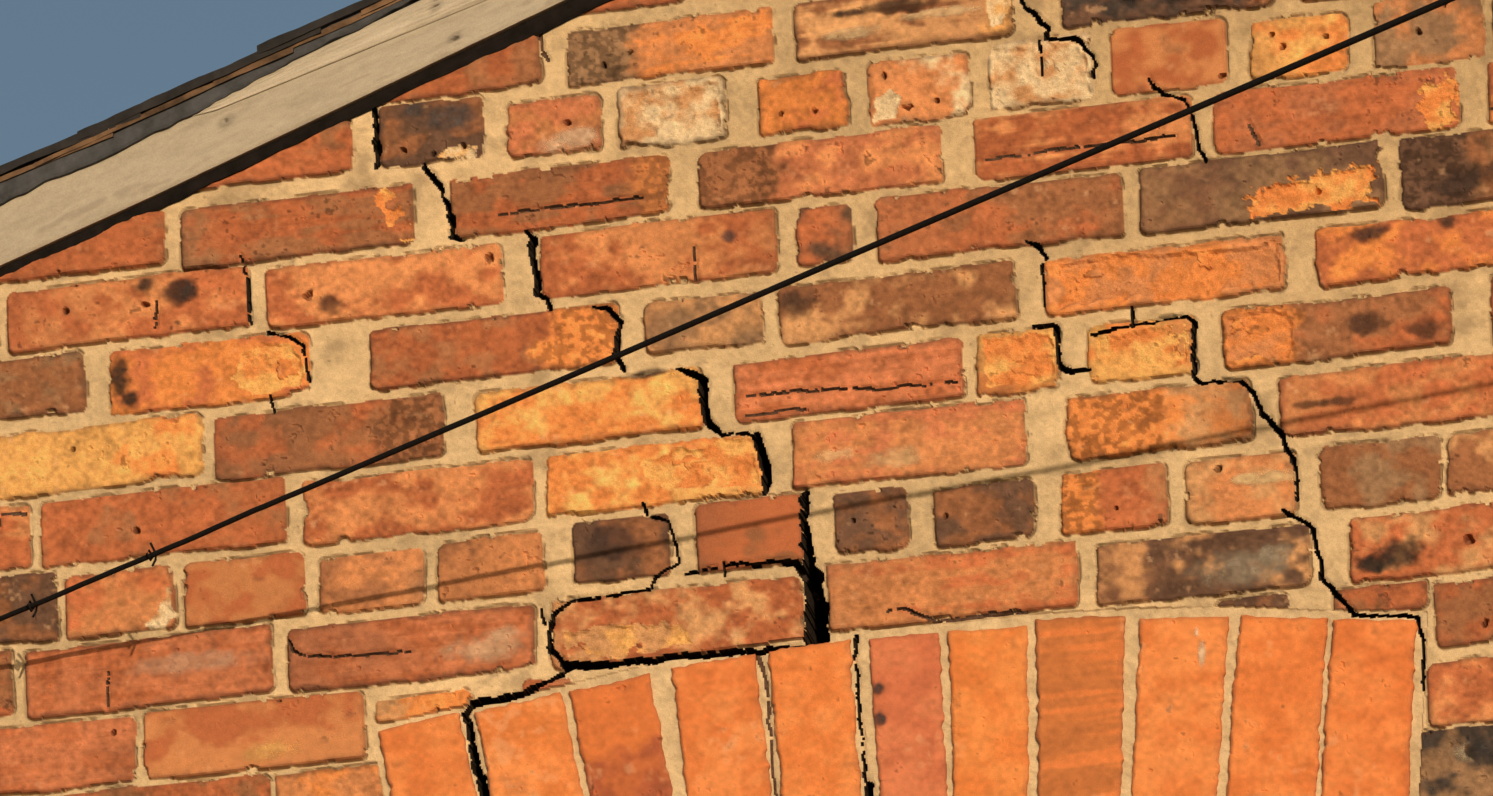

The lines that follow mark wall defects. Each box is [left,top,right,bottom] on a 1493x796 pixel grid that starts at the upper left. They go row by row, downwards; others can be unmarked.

crack [1019,0,1098,79]
crack [371,107,383,170]
crack [985,77,1208,164]
crack [1248,124,1261,146]
crack [422,162,466,242]
crack [498,195,644,312]
crack [690,246,698,282]
crack [592,305,626,373]
crack [1025,240,1426,692]
crack [461,367,958,796]
crack [886,607,1028,624]